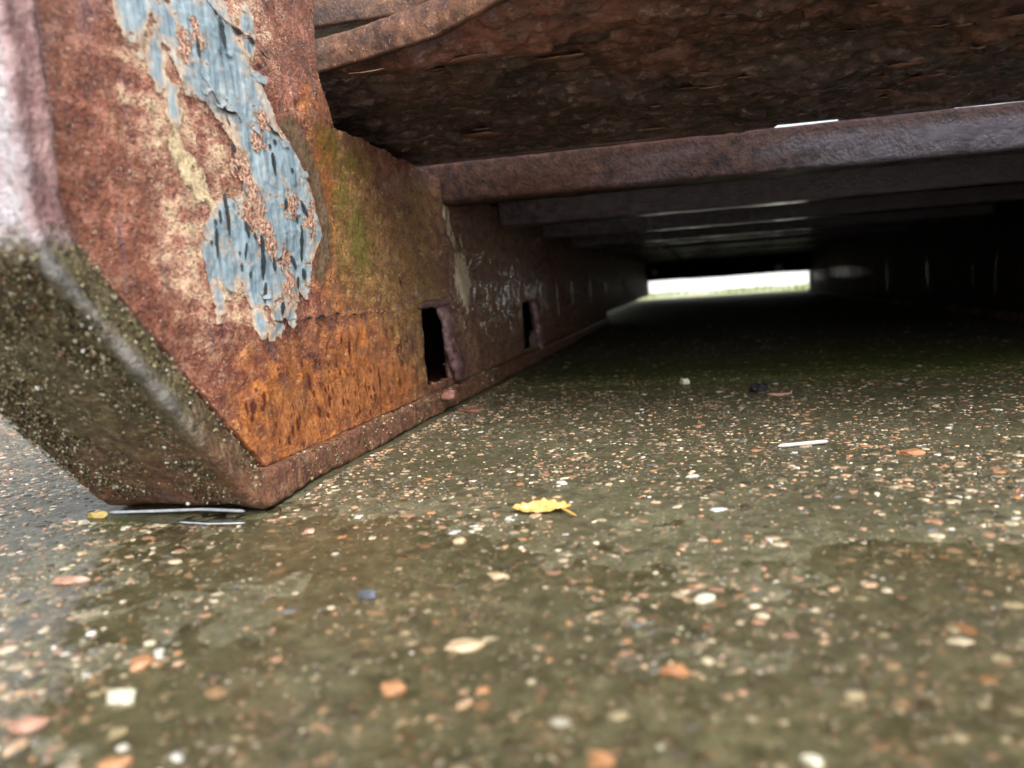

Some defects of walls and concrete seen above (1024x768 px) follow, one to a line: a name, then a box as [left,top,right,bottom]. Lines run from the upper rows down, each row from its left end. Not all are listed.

corrosion [348,68,394,76]
peeling [112,0,323,342]
corrosion [266,328,415,446]
corrosion [442,389,457,400]